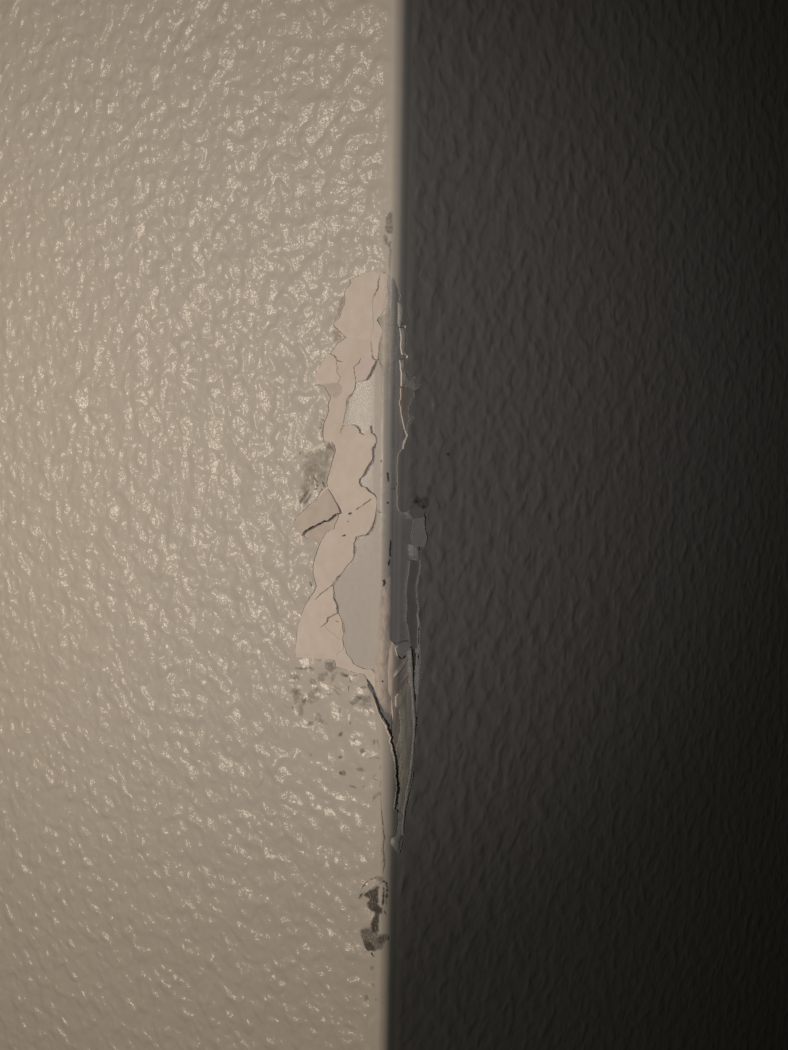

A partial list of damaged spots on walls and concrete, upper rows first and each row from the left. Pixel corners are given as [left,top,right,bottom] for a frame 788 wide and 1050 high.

peeling [294,271,420,688]
peeling [402,502,428,561]
crack [365,677,400,873]
peeling [388,614,422,854]